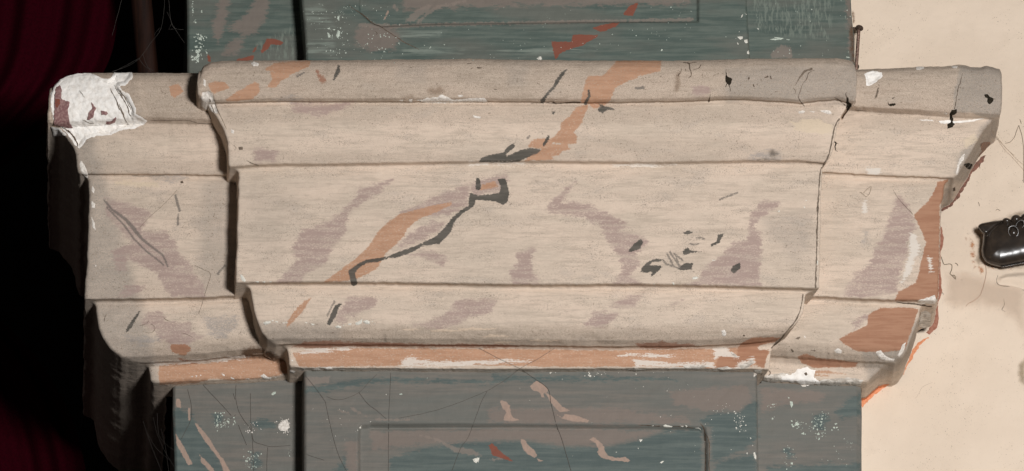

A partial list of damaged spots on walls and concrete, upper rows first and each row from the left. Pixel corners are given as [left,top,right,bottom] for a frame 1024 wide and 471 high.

spalling [51,72,147,148]
crack [771,92,863,349]
peeling [876,227,944,375]